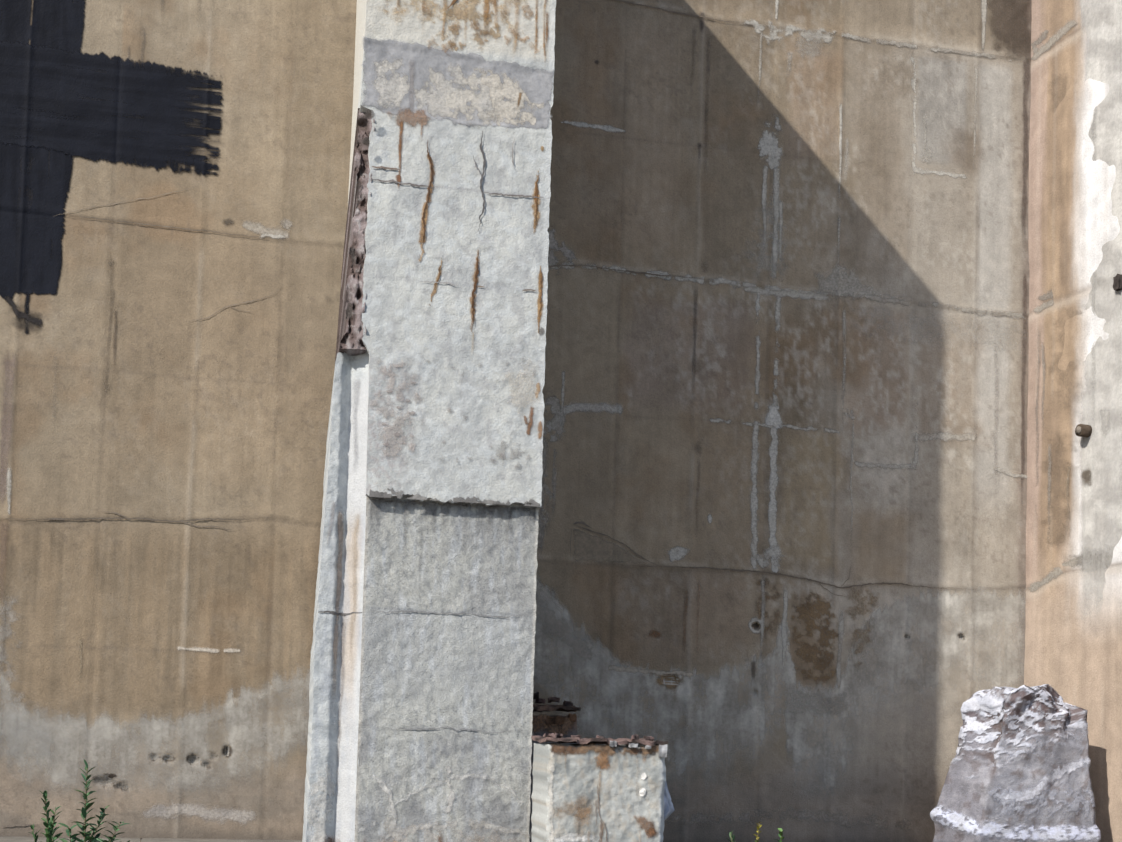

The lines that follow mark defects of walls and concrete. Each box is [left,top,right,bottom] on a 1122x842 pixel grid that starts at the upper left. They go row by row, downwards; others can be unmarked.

corrosion [396,109,428,186]
crack [372,142,483,287]
peeling [334,0,554,370]
crack [473,131,548,234]
corrosion [532,171,540,230]
corrosion [470,250,479,336]
leakage [534,0,1122,789]
leakage [371,372,622,548]
crack [570,521,966,598]
leakage [0,601,310,789]
corrosion [532,714,659,786]
leakage [143,804,254,823]